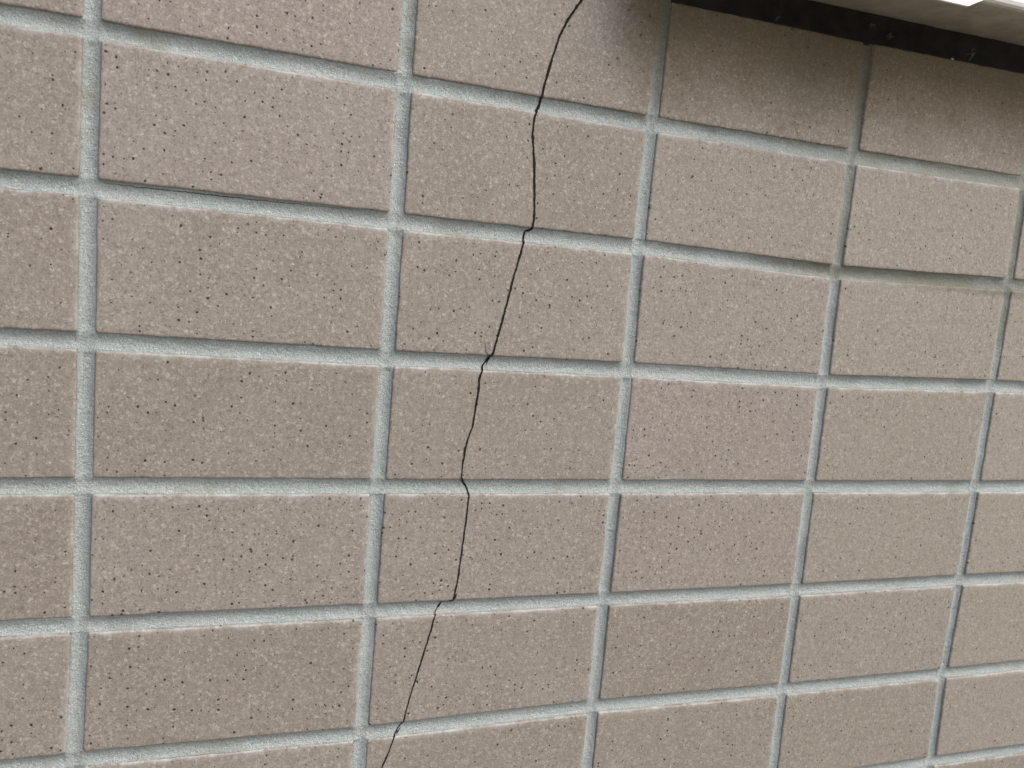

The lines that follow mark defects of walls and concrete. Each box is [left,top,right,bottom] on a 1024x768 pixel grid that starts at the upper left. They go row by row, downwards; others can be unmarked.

crack [381,0,583,768]